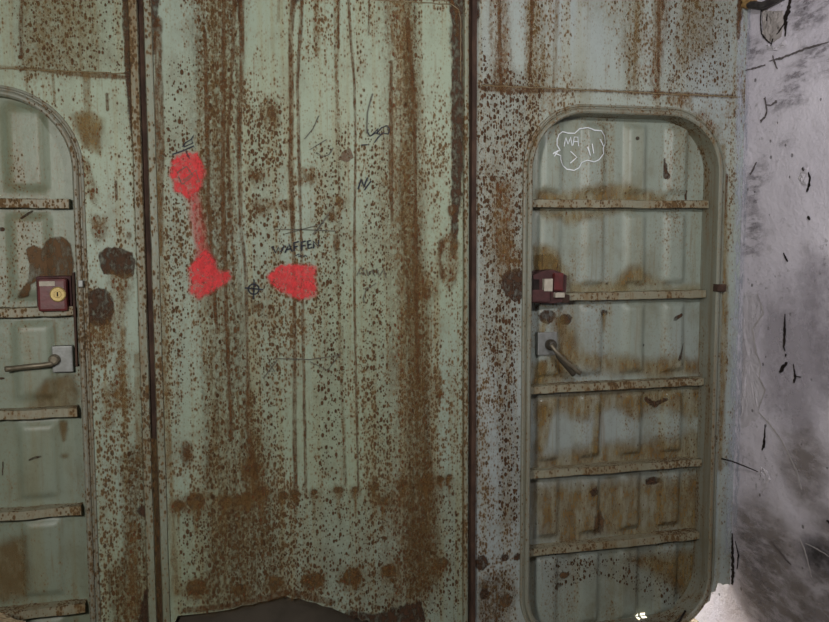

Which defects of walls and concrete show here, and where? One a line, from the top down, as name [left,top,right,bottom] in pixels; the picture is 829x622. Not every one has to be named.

spalling [760,0,791,51]
rust [12,0,132,132]
rust [75,113,101,149]
rust [89,215,107,241]
rust [19,237,74,298]
rust [89,247,140,432]
crack [779,314,801,383]
crack [758,412,802,489]
rust [108,422,162,622]
rust [533,477,696,542]
rust [475,553,520,622]
rust [539,546,694,605]